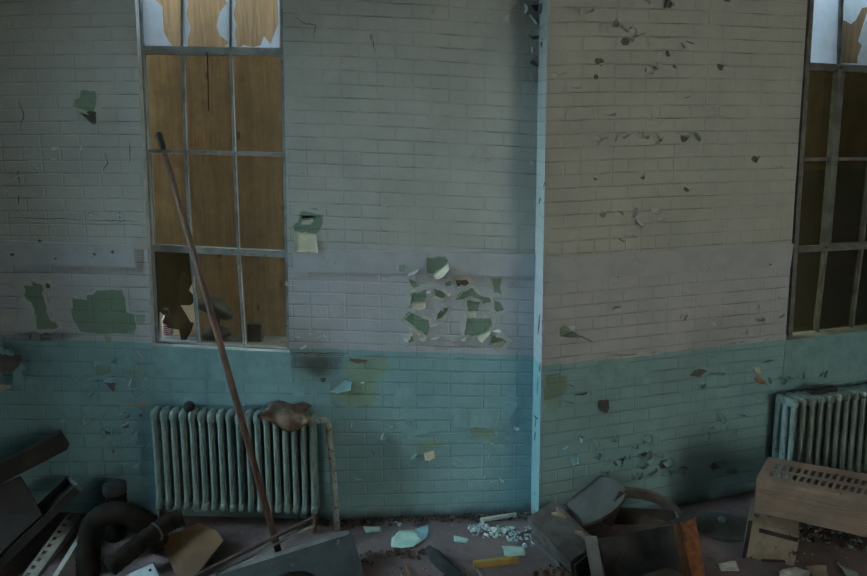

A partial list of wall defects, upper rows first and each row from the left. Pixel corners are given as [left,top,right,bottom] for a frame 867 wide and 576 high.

peeling [71,90,102,124]
peeling [17,278,63,334]
peeling [71,287,145,344]
peeling [396,254,514,353]
peeling [328,354,389,410]